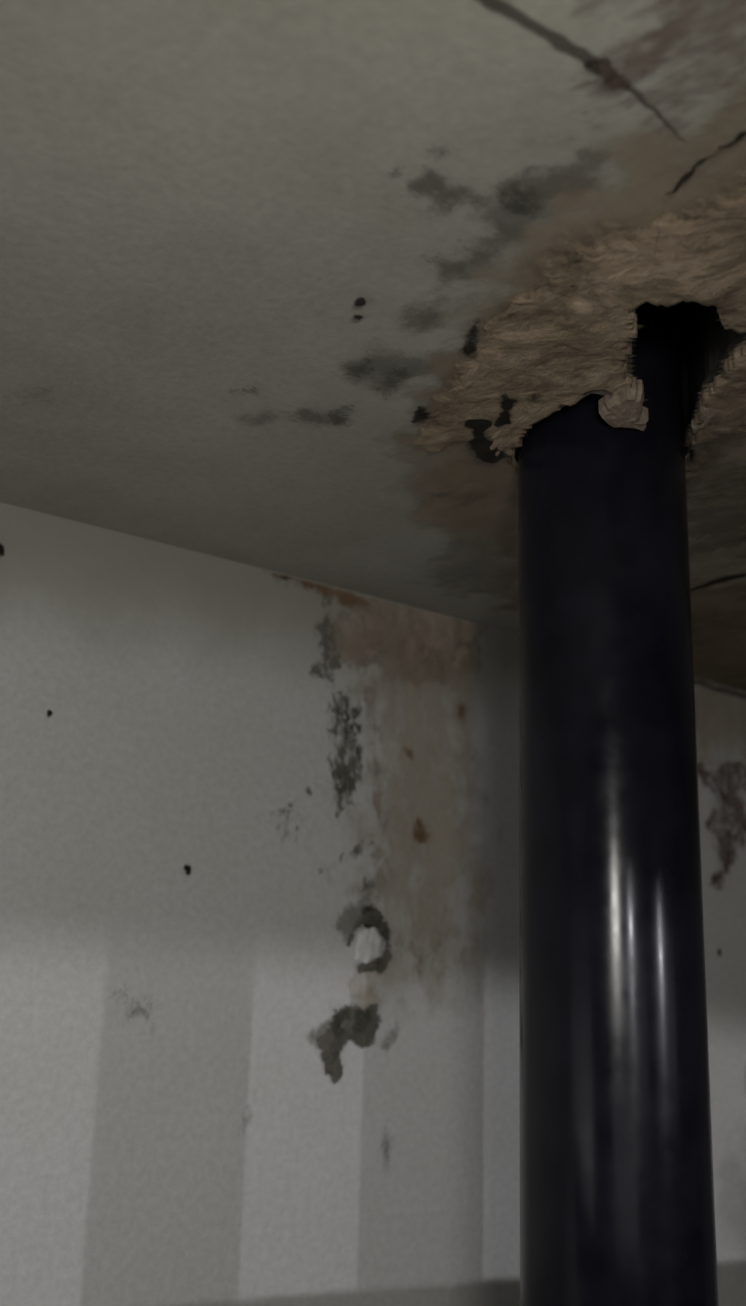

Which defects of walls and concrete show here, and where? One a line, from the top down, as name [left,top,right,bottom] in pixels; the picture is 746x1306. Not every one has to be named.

damp [440,101,746,286]
crack [479,0,746,195]
damp [353,297,366,320]
flaking render [411,170,746,493]
damp [398,434,518,609]
damp [685,414,746,690]
damp [327,679,379,818]
damp [340,651,470,948]
spalling [310,876,397,1084]